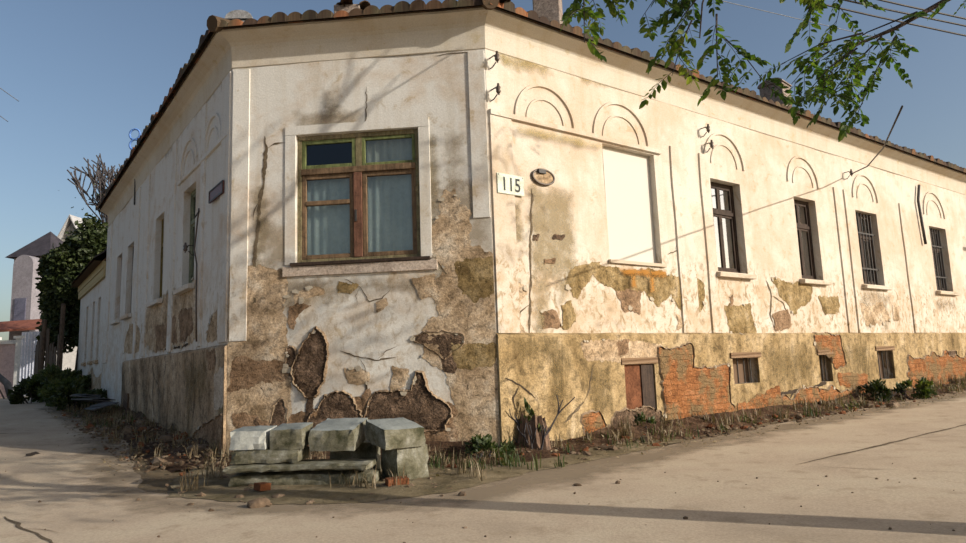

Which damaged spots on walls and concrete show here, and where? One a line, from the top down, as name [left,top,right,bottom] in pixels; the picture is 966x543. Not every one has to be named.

crack [252,136,283,267]
flaking render [123,189,500,457]
crack [346,279,390,306]
flaking render [540,262,683,330]
flaking render [697,278,707,313]
flaking render [771,277,840,331]
crack [341,346,397,390]
flaking render [580,332,869,435]
flaking render [906,350,966,389]